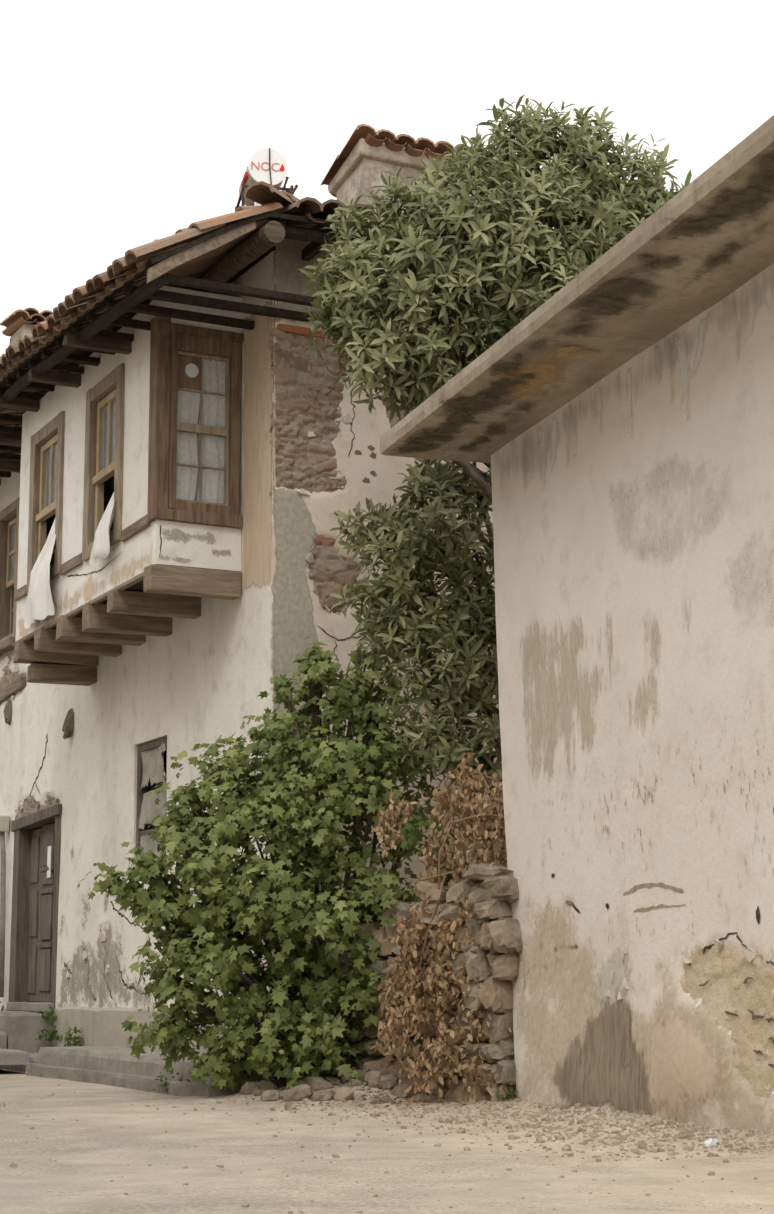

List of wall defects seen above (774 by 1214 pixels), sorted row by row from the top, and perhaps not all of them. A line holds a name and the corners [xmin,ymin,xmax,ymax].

flaking render [268,326,352,498]
spalling [354,445,377,483]
flaking render [306,534,406,662]
peeling [59,923,150,1008]
water stain [554,995,650,1115]
flaking render [680,938,774,1098]